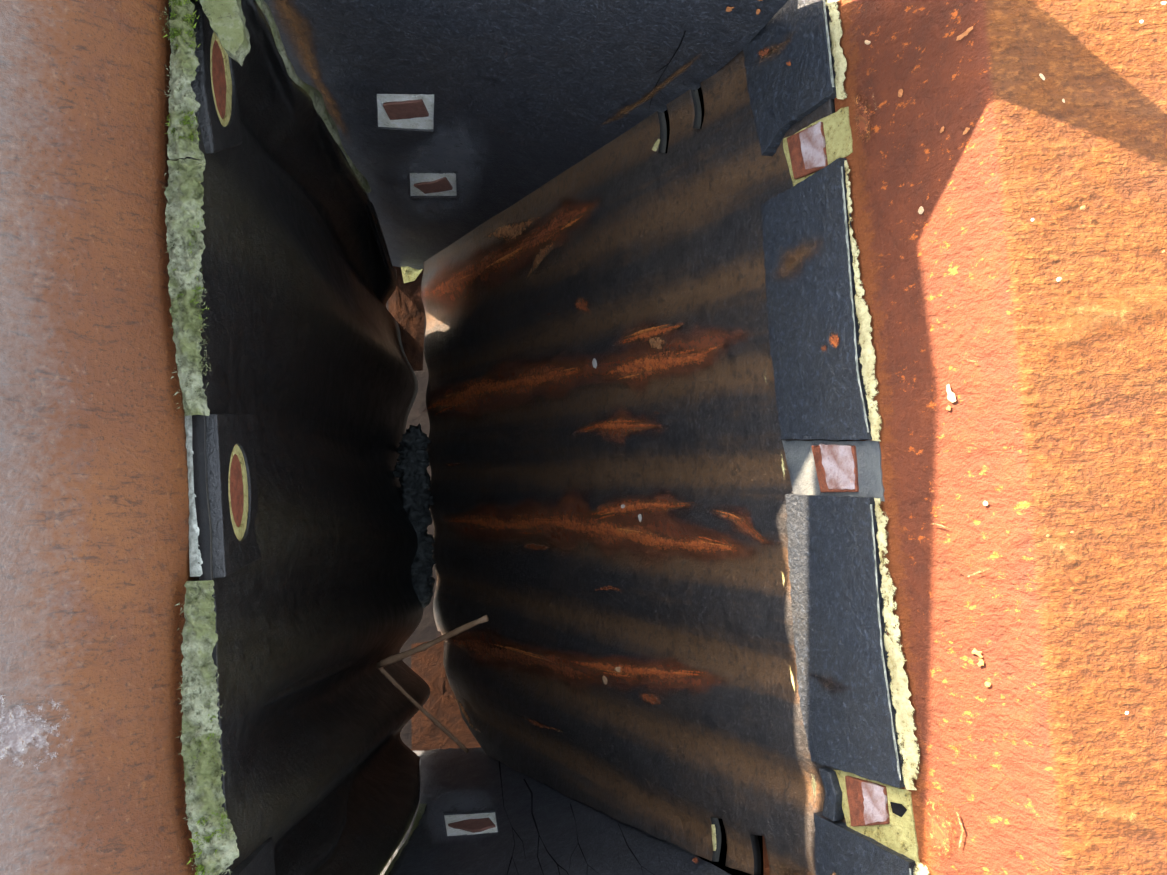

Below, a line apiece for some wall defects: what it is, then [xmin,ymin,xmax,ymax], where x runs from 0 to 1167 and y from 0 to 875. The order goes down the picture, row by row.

corrosion [388,202,592,371]
corrosion [425,324,740,416]
corrosion [580,412,658,441]
corrosion [449,494,769,559]
corrosion [411,630,715,751]